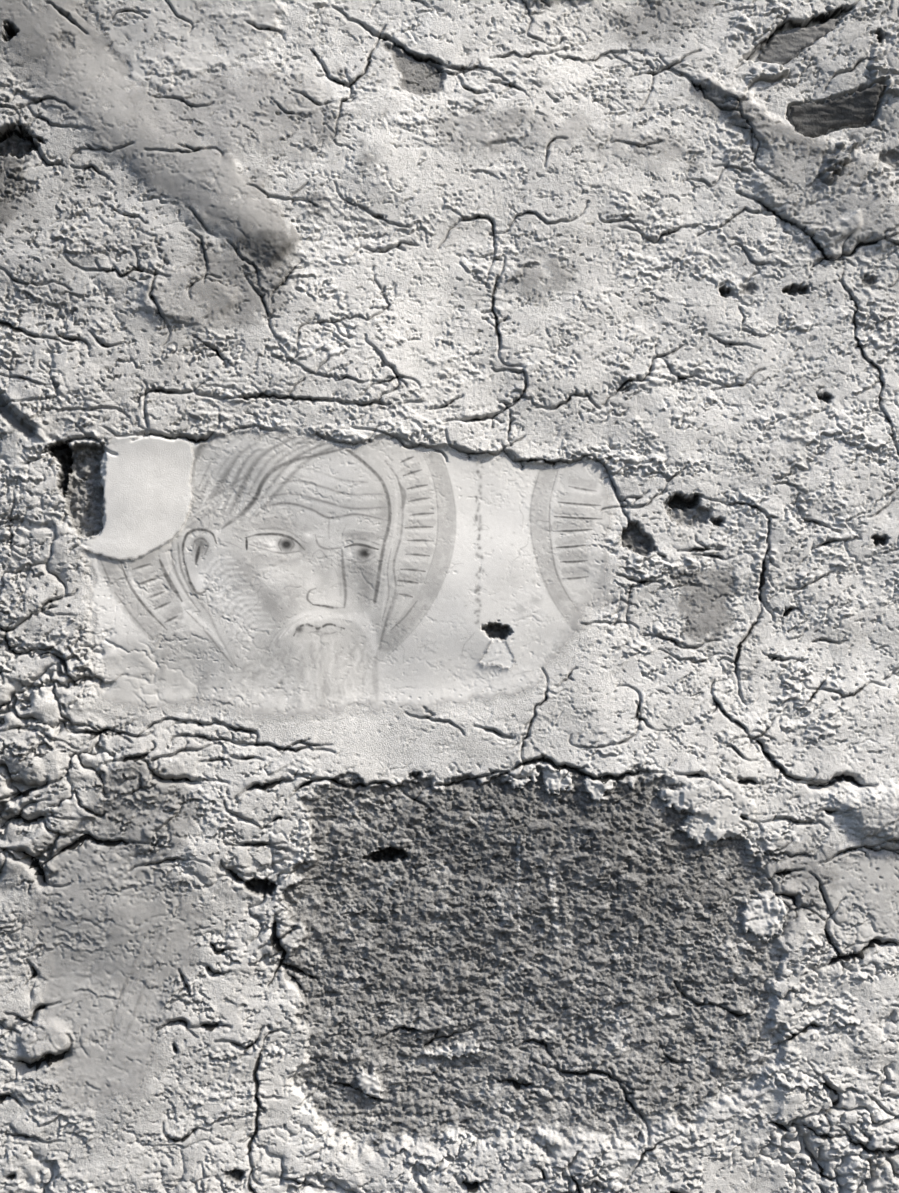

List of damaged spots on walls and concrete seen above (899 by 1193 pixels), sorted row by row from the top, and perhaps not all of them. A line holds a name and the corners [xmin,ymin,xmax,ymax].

water stain [136,69,335,148]
crack [284,1,546,114]
flaking render [757,13,845,65]
flaking render [788,83,887,138]
water stain [197,242,283,321]
crack [657,98,899,432]
crack [401,211,676,526]
crack [0,599,703,887]
crack [658,495,875,827]
spalling [283,760,787,1150]
crack [771,854,897,969]
crack [159,1020,279,1193]